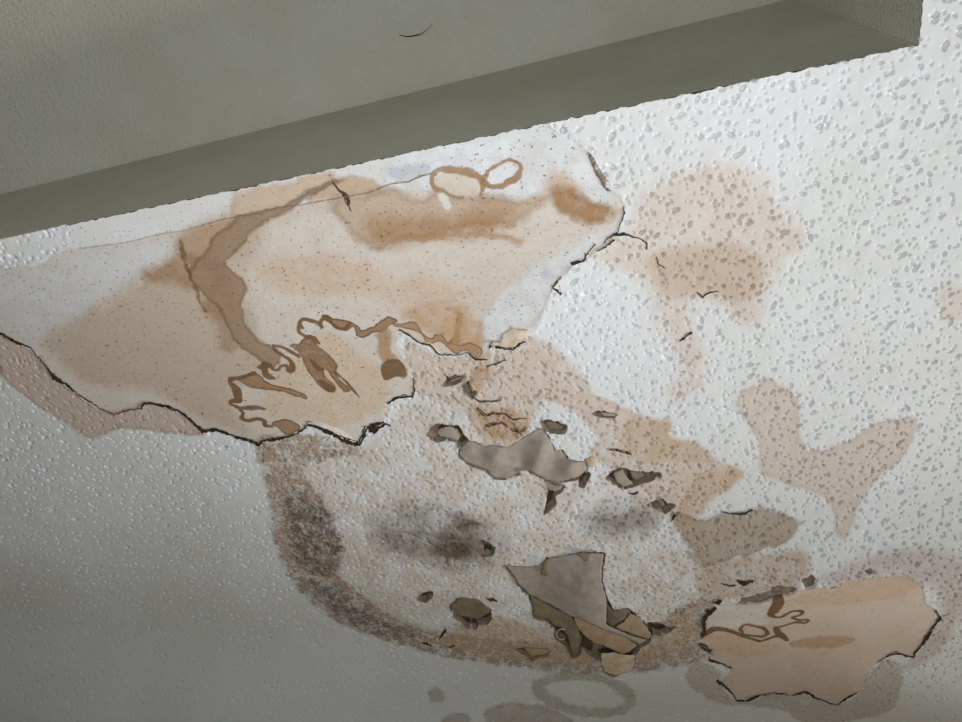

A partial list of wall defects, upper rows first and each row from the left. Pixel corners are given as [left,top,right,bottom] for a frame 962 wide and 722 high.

peeling [0,124,624,443]
leakage [0,158,853,673]
leakage [738,379,916,537]
peeling [701,568,936,703]